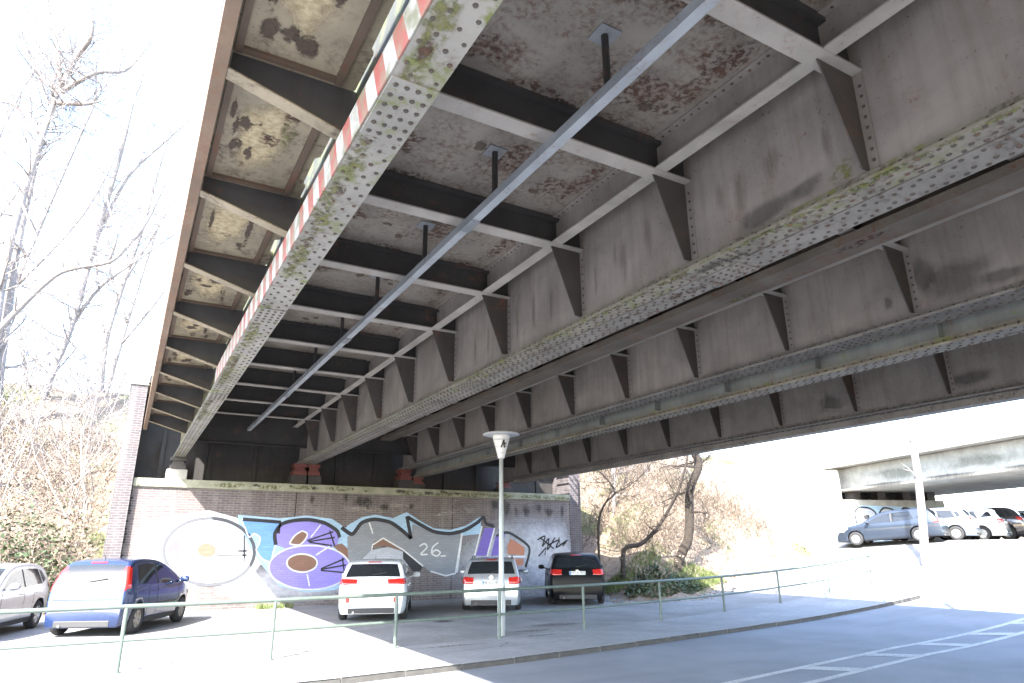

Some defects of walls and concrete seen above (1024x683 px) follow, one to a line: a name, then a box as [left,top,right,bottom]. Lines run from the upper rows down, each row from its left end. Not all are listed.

corrosion [468,35,519,59]
corrosion [618,45,746,114]
corrosion [402,131,425,153]
corrosion [498,145,533,170]
corrosion [528,163,605,199]